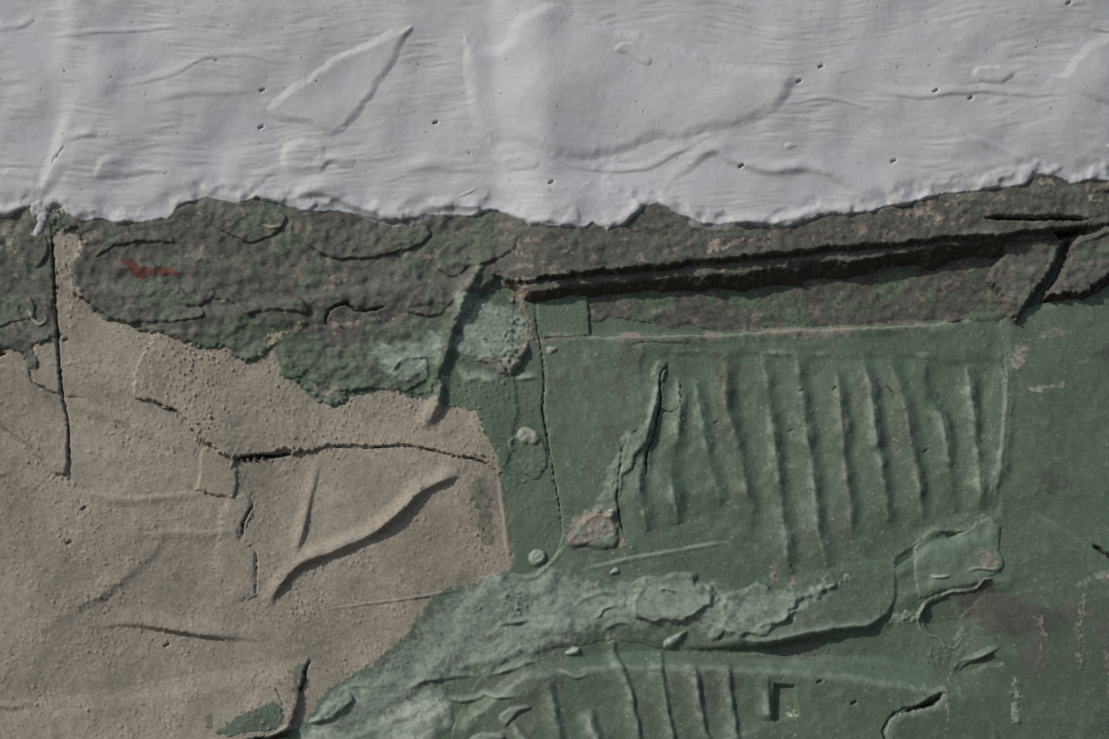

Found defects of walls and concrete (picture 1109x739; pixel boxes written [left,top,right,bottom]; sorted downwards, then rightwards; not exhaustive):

peeling [196,204,314,244]
peeling [707,231,775,254]
peeling [906,200,943,224]
peeling [985,215,1109,326]
crack [30,243,76,462]
peeling [456,275,539,386]
flaking render [0,222,502,603]
crack [237,452,290,460]